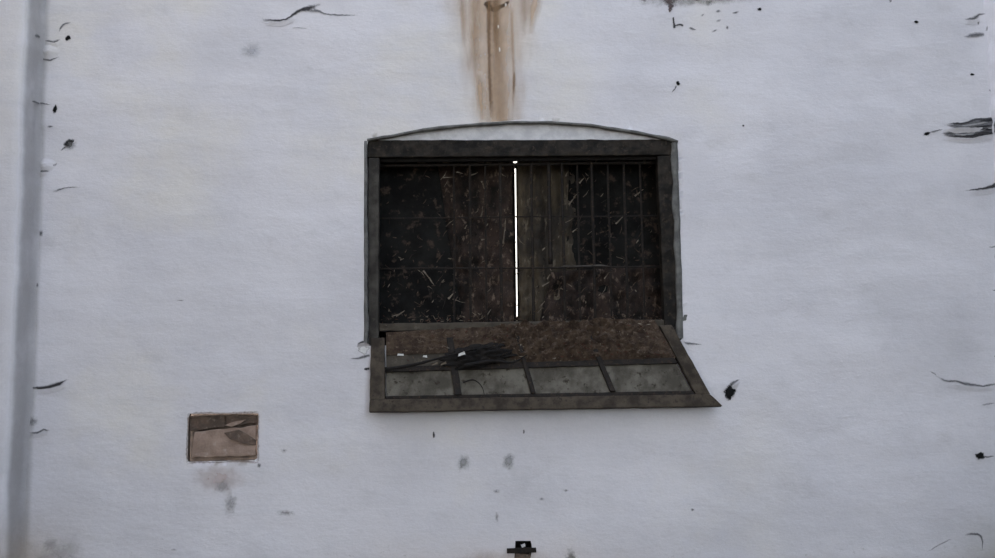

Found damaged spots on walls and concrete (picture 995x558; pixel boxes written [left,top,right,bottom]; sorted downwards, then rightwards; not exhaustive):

corrosion [478,0,515,122]